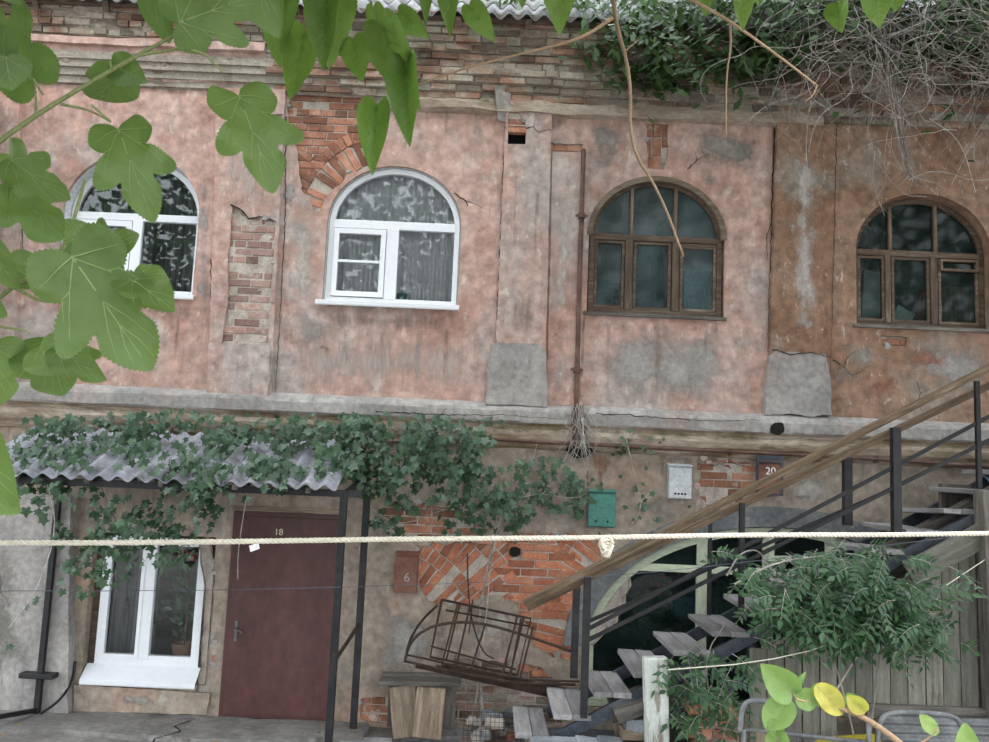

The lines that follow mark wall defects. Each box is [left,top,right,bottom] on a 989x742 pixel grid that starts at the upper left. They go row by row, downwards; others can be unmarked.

flaking render [273,95,369,213]
flaking render [644,122,668,170]
flaking render [223,207,276,344]
crack [766,124,863,379]
flaking render [694,456,756,506]
flaking render [377,498,631,661]
flaking render [454,655,566,727]